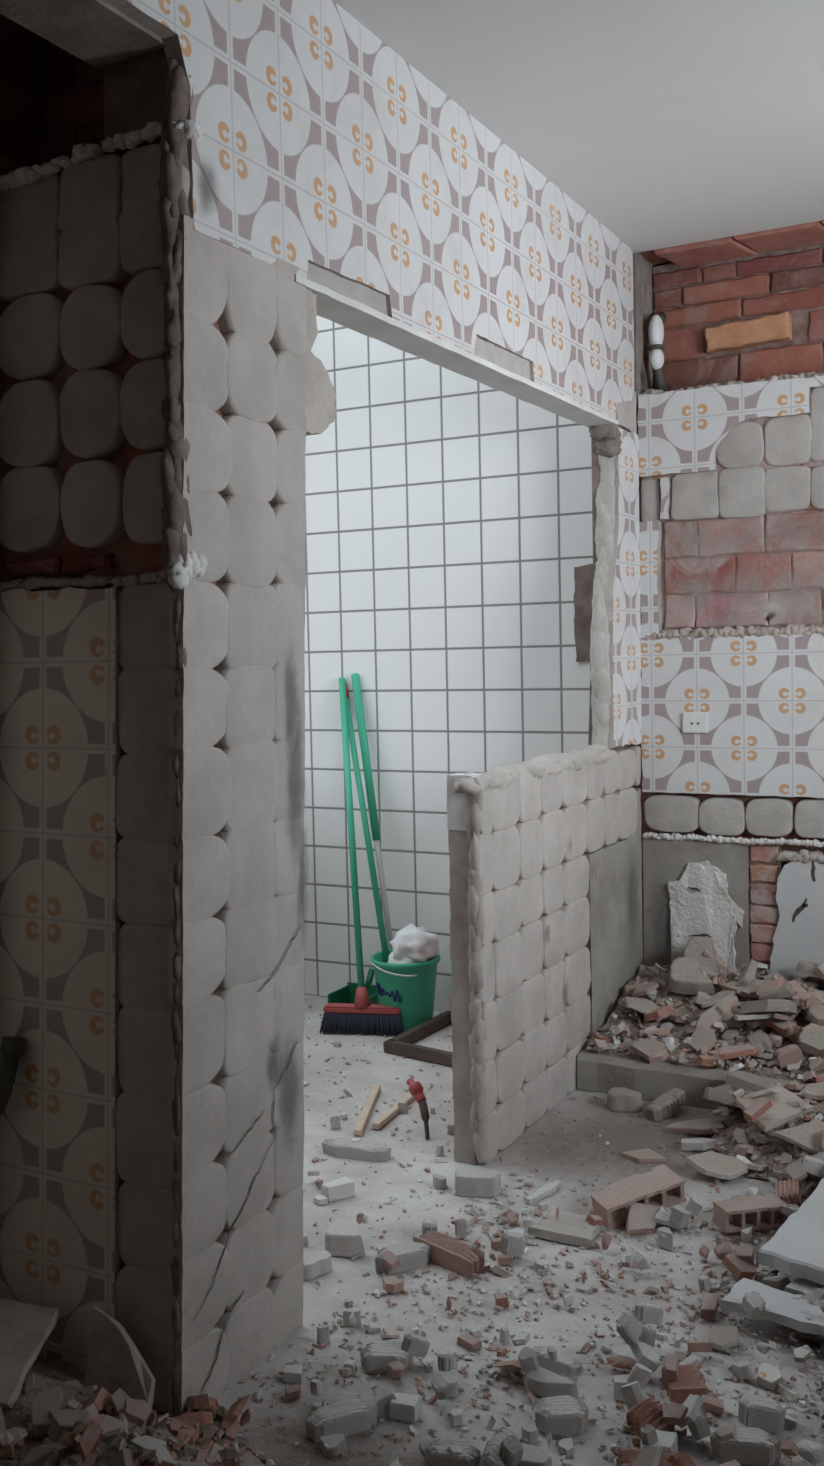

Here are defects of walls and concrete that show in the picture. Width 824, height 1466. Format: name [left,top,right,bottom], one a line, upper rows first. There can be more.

peeling [0,14,388,1417]
peeling [453,220,824,1165]